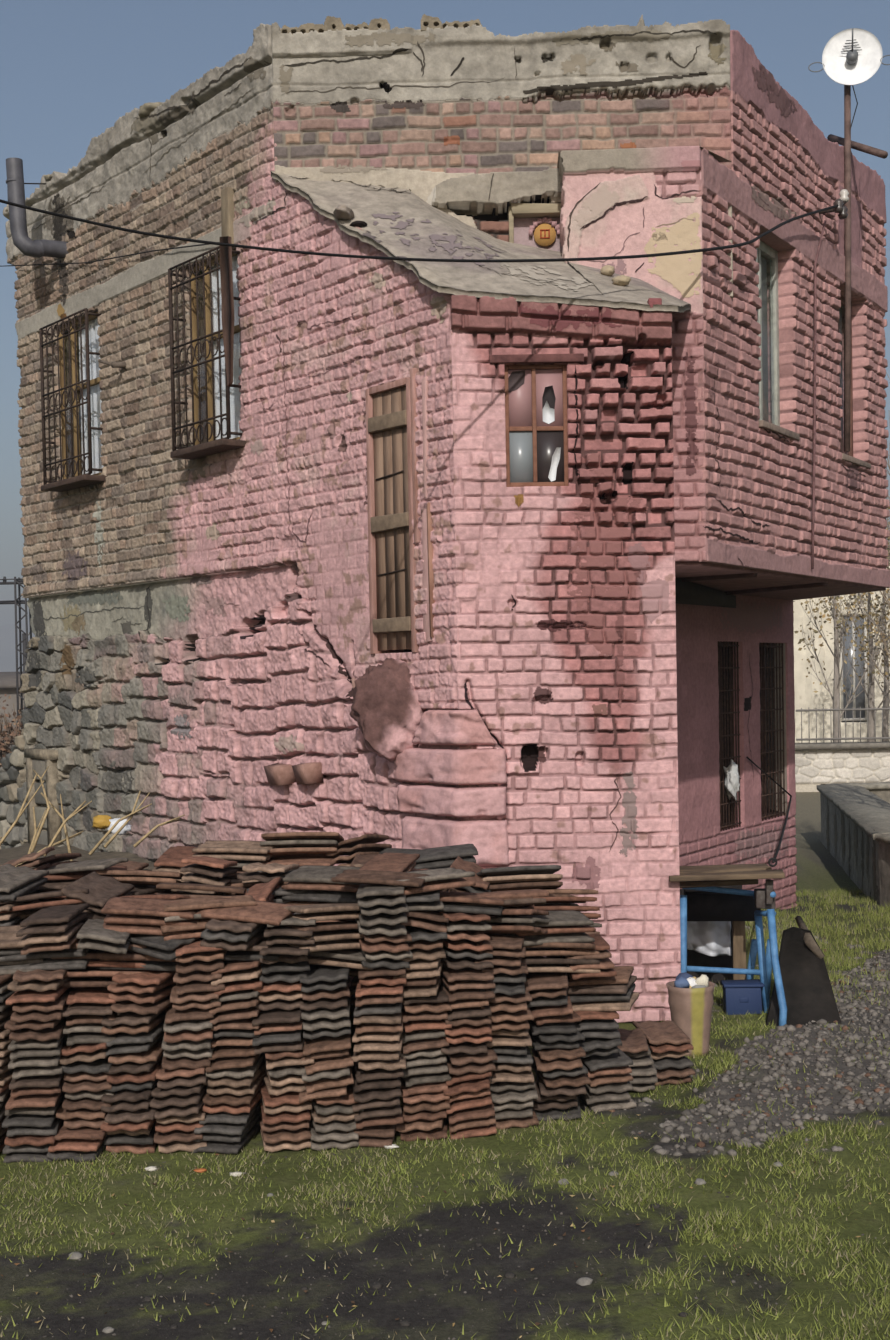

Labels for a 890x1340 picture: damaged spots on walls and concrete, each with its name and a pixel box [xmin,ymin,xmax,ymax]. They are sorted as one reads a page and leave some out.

crack [286,41,517,93]
crack [573,29,717,68]
crack [567,182,698,272]
spalling [285,564,302,603]
crack [299,625,356,700]
peeling [170,714,192,740]
peeling [274,734,304,755]
crack [464,681,507,759]